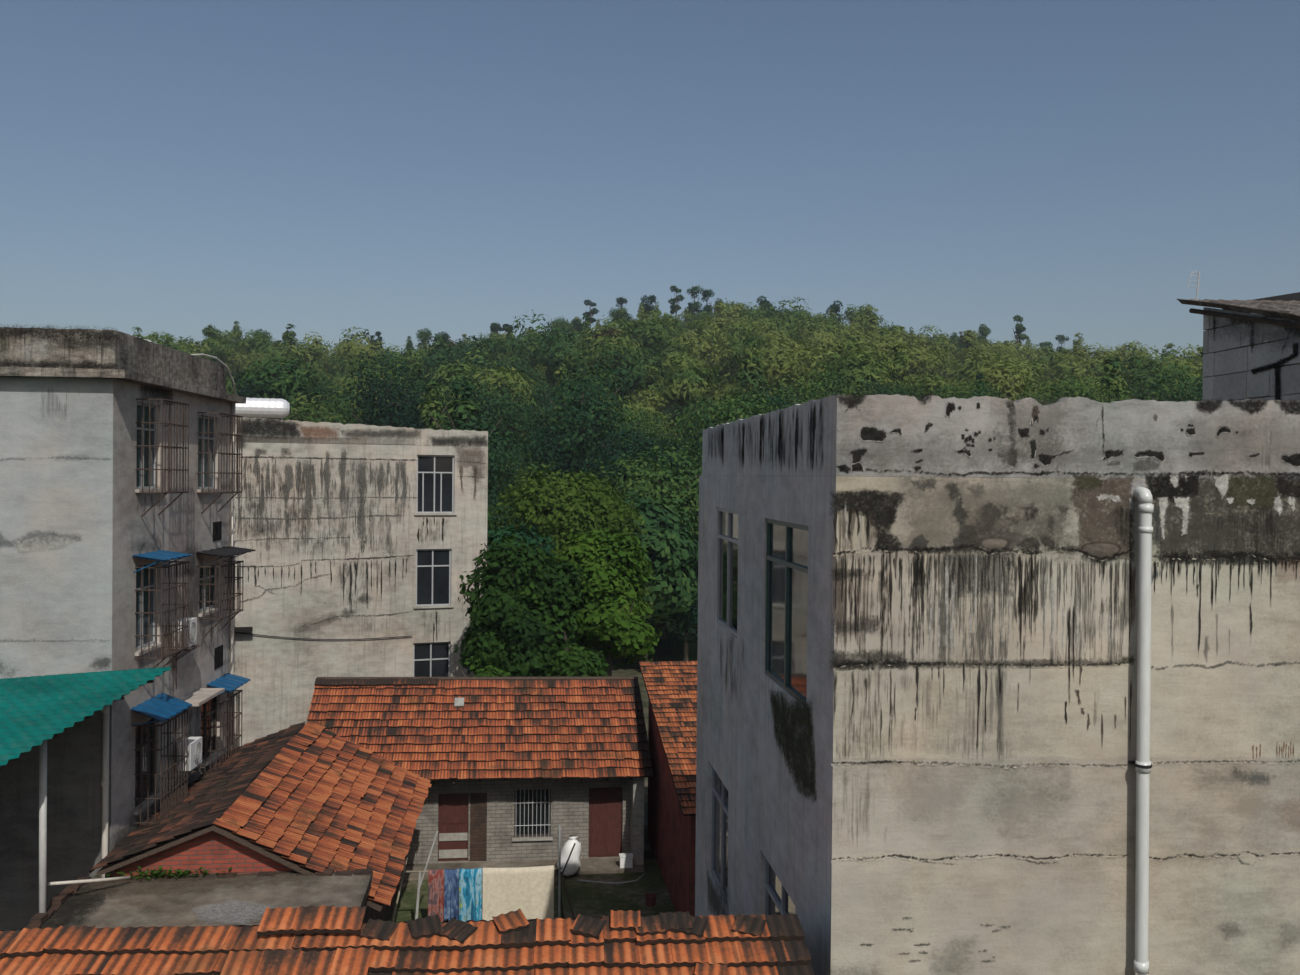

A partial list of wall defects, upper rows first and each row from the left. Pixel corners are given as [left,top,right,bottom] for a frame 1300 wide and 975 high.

spalling [925,402,961,432]
spalling [838,426,901,474]
spalling [1018,405,1073,468]
spalling [1281,453,1300,467]
peeling [1214,474,1255,505]
water stain [235,418,486,612]
crack [833,543,1300,564]
water stain [830,473,1300,758]
crack [833,660,1300,671]
water stain [770,692,817,800]
crack [831,759,1300,770]
crack [831,851,1300,865]